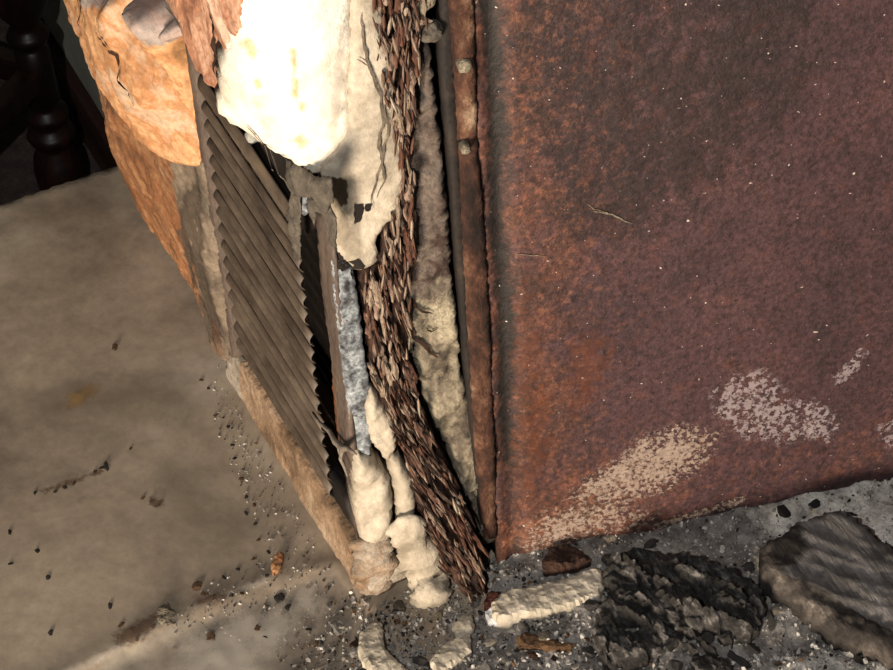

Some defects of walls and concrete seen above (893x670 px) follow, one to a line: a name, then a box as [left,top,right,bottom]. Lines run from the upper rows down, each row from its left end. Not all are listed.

peeling [285,158,365,304]
spalling [354,204,372,224]
water stain [523,425,745,551]
spalling [271,552,284,577]